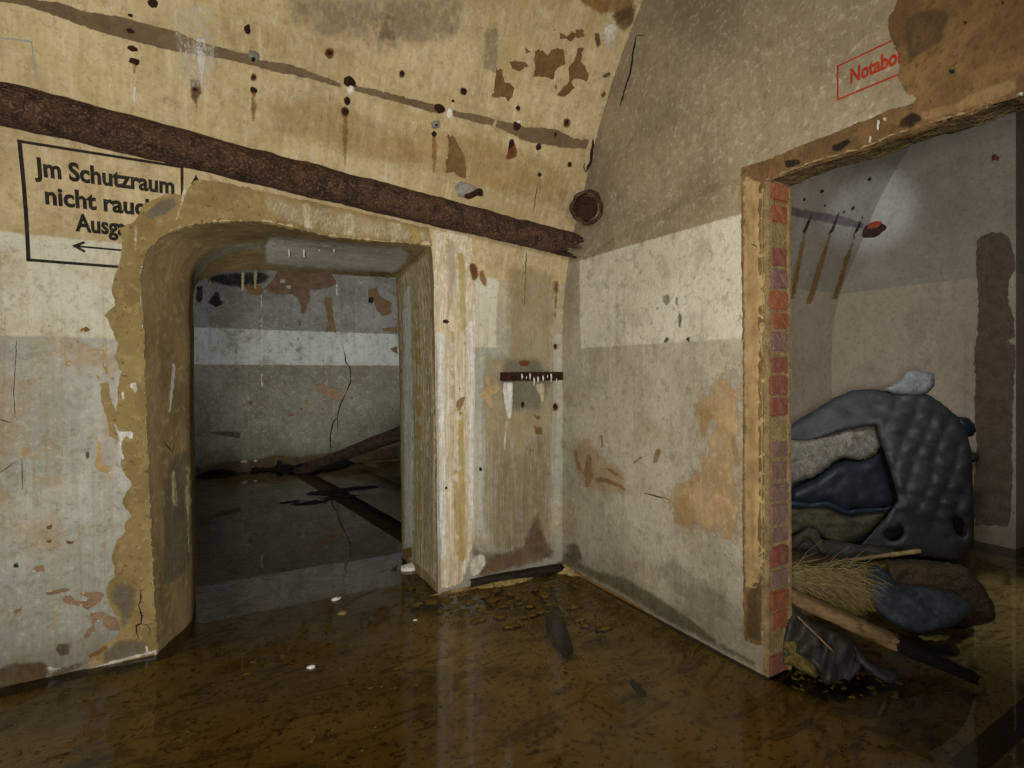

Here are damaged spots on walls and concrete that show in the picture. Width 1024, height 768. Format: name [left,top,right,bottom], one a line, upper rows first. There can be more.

peeling [491,28,589,101]
crack [620,35,644,105]
peeling [446,135,467,179]
spalling [663,0,1024,645]
peeling [45,180,432,668]
crack [329,345,351,450]